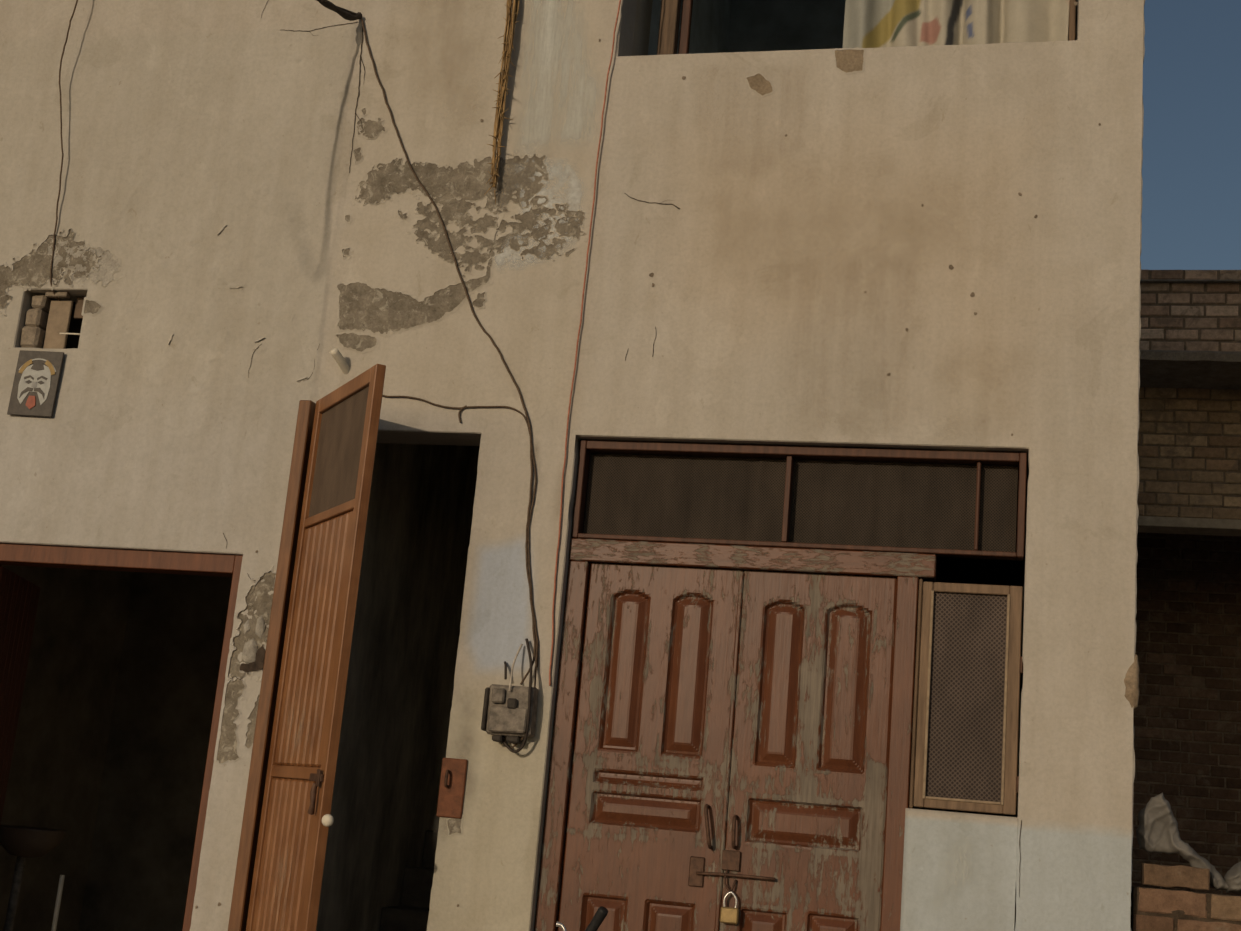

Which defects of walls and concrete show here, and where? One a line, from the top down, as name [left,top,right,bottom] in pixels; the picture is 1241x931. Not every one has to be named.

spalling [745,72,775,98]
spalling [833,47,866,75]
spalling [0,228,123,317]
peeling [334,106,587,354]
spalling [214,566,276,766]